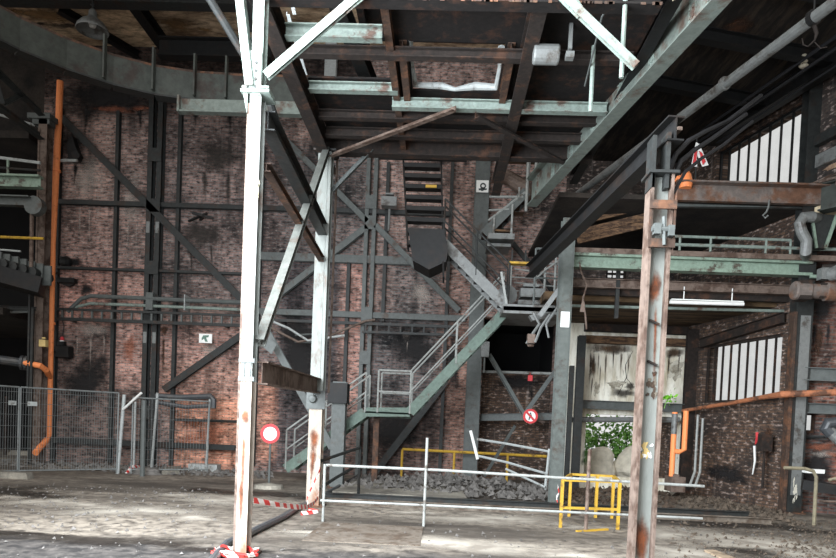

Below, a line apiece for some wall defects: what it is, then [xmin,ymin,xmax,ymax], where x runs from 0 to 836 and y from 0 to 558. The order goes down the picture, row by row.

corrosion [649,276,661,299]
damp [590,345,629,390]
damp [667,349,683,378]
corrosion [636,522,648,558]